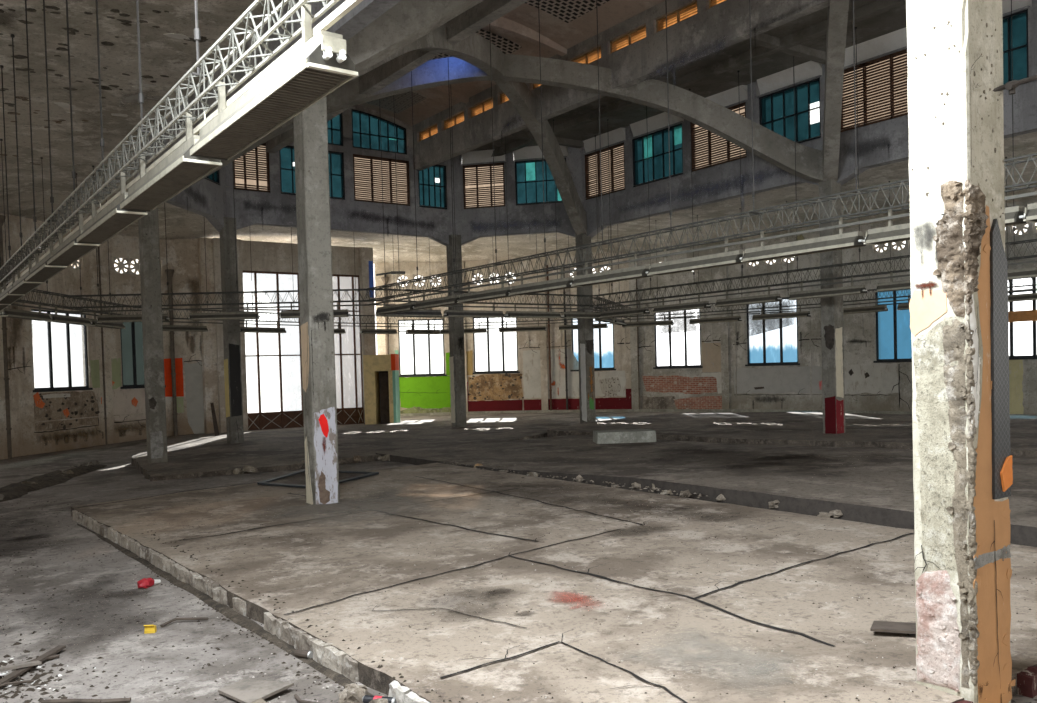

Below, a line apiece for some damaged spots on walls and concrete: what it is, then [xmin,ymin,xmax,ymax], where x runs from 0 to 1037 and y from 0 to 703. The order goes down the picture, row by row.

peeling [824,325,899,398]
peeling [305,406,338,505]
peeling [913,179,1015,703]